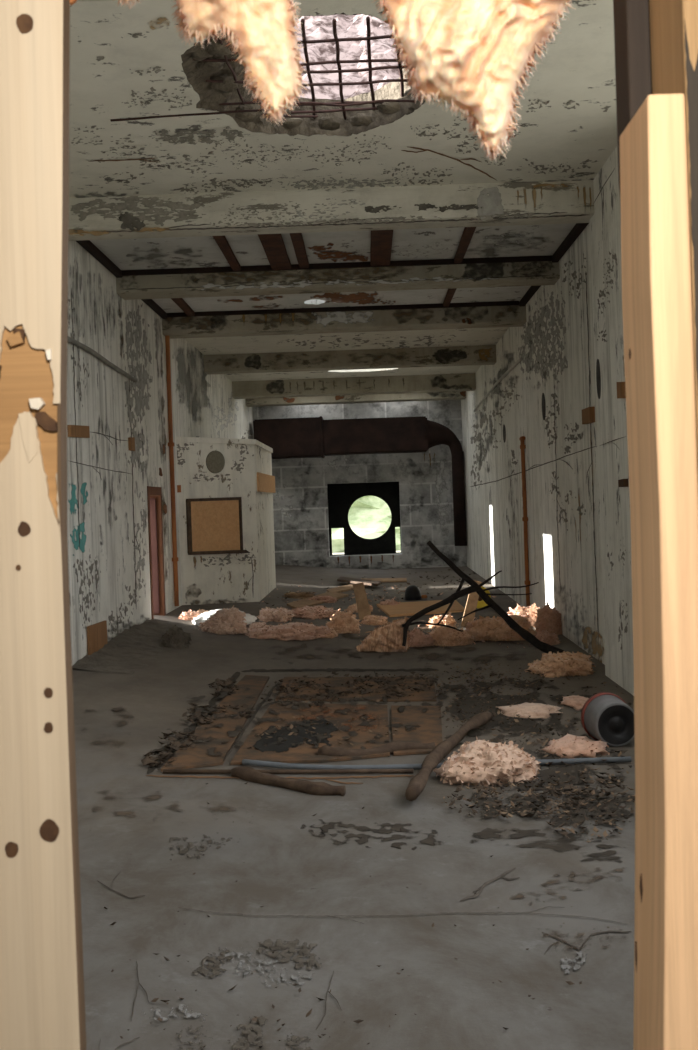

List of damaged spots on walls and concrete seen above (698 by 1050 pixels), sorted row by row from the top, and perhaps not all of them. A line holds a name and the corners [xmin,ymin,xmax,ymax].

spalling [71,12,551,231]
peeling [527,99,579,112]
peeling [201,281,312,290]
rust [308,243,368,262]
peeling [597,252,617,314]
peeling [122,303,153,473]
peeling [470,258,587,490]
peeling [73,555,101,626]
peeling [108,491,147,635]